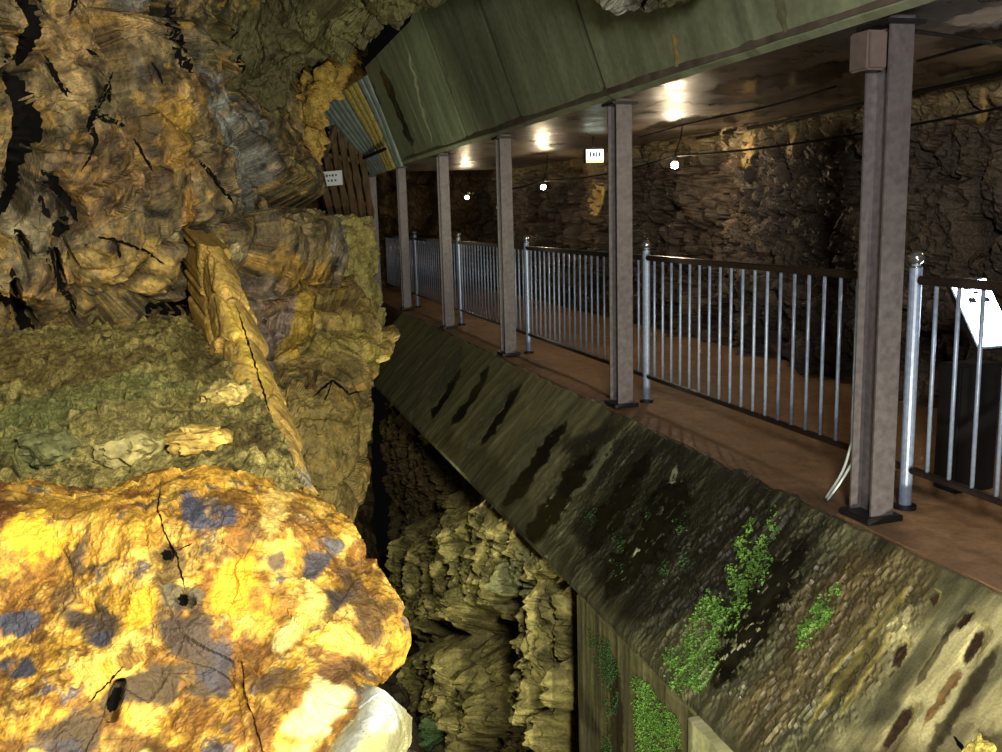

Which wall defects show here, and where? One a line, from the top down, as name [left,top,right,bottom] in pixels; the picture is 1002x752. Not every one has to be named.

leakage [711,533,812,688]
leakage [609,668,623,752]